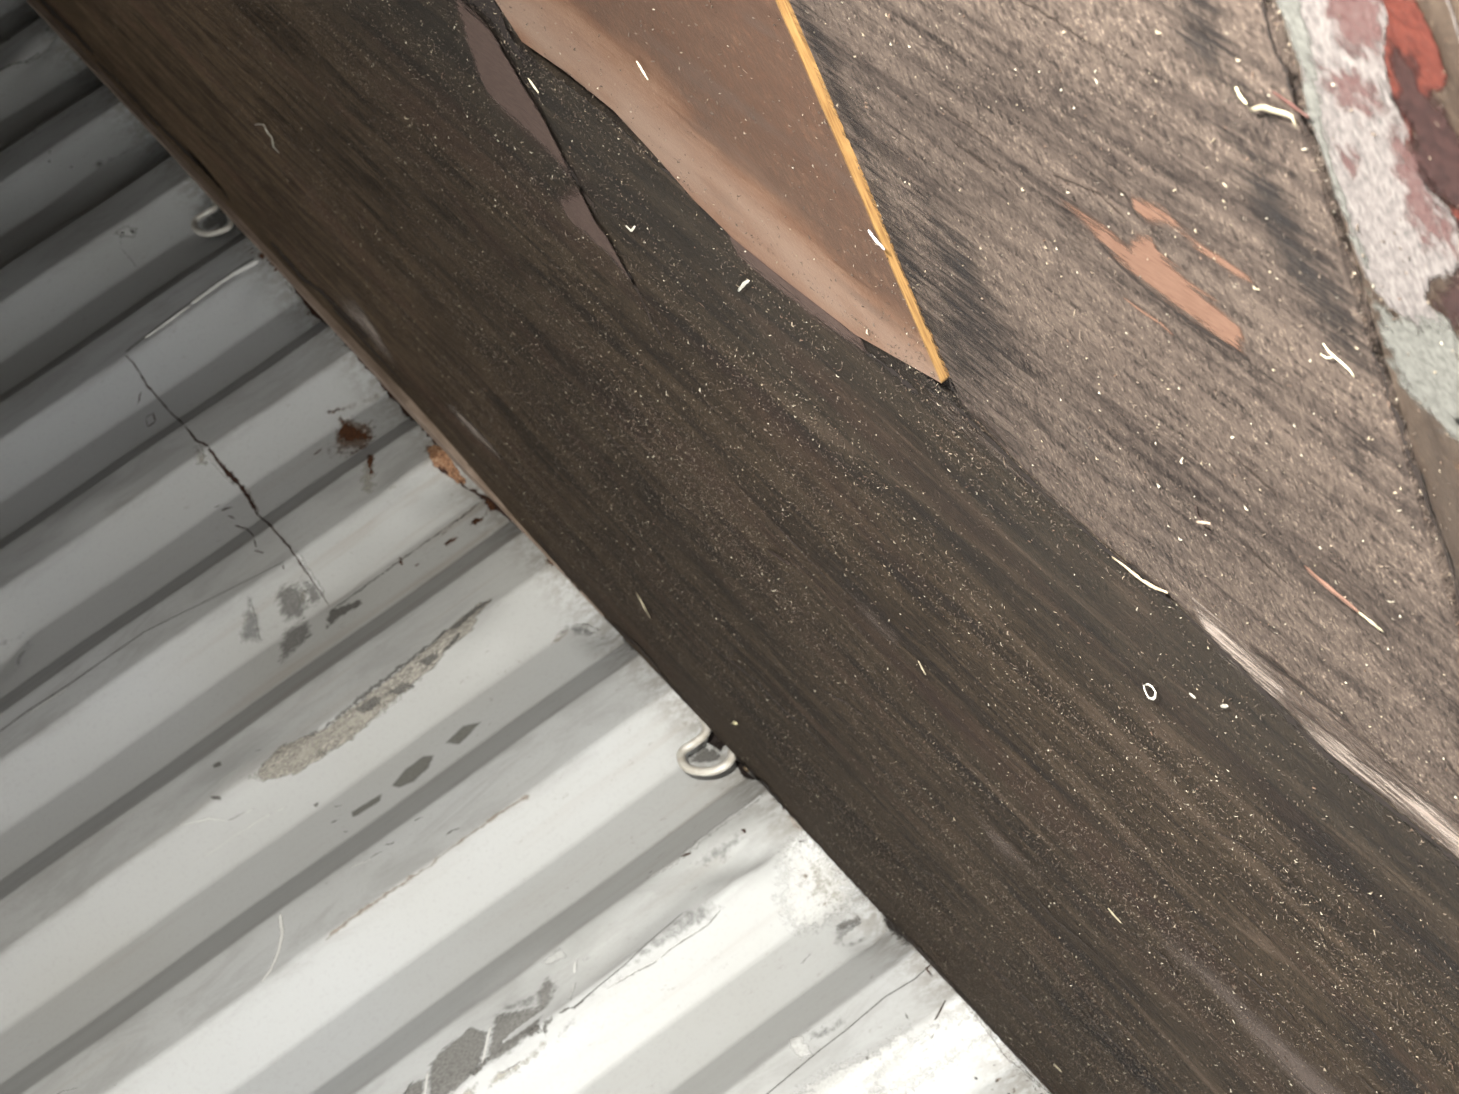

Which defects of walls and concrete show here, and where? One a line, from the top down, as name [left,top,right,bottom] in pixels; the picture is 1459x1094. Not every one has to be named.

peeling [1276,0,1459,441]
crack [125,355,329,606]
rust [314,408,375,491]
crack [455,0,1459,867]
peeling [257,599,491,780]
crack [735,756,1058,1094]